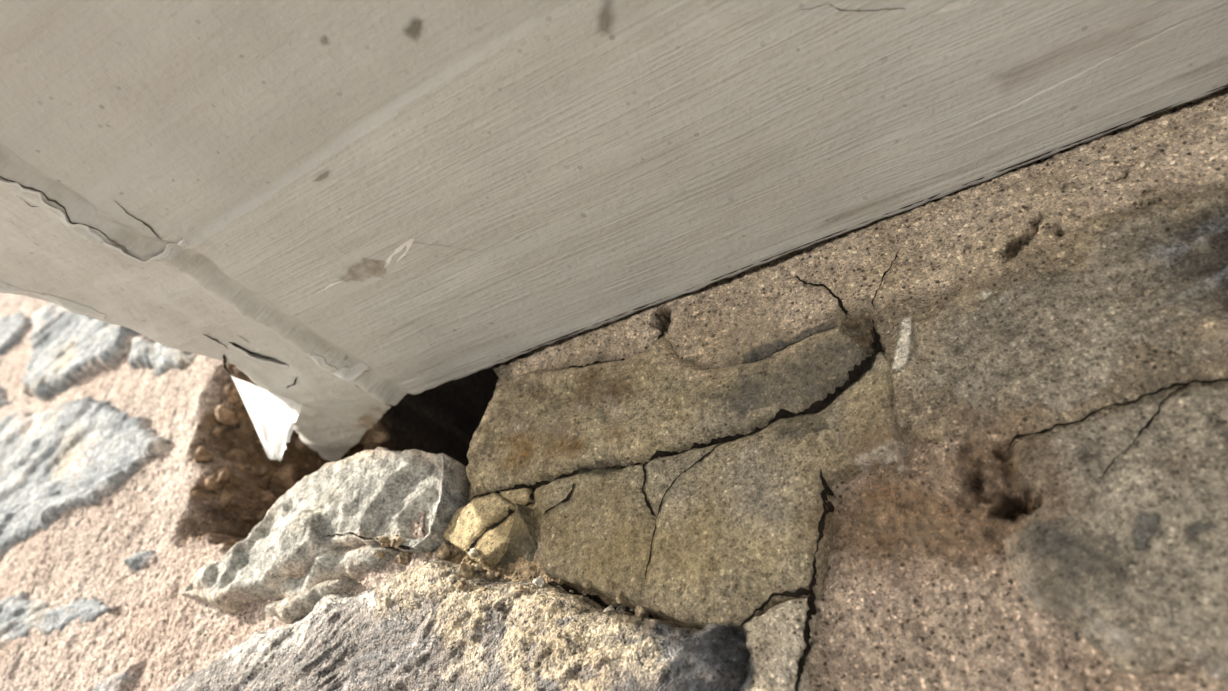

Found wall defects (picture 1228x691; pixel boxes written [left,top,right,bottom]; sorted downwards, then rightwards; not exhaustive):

crack [0,176,190,263]
peeling [318,238,414,293]
crack [467,84,1228,579]
crack [547,580,653,620]
crack [740,466,834,691]